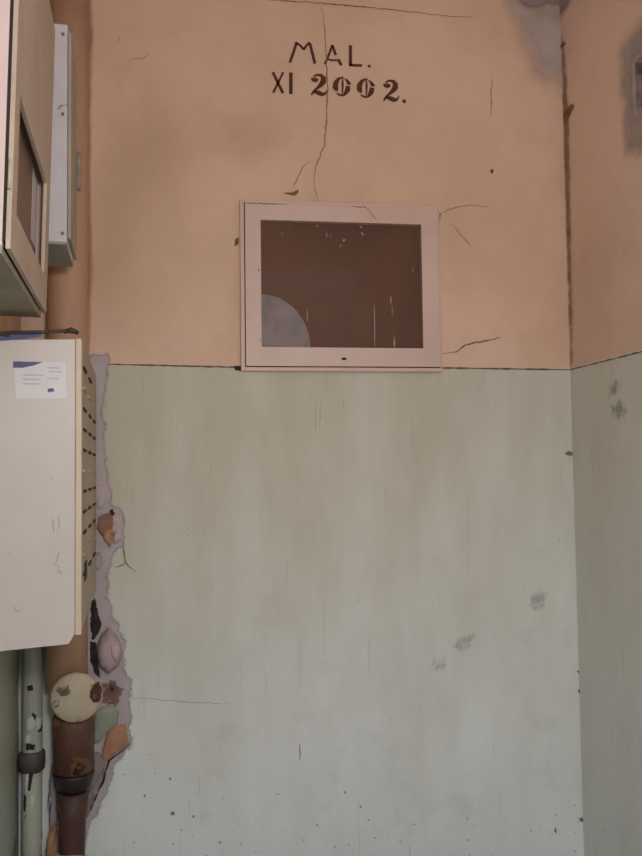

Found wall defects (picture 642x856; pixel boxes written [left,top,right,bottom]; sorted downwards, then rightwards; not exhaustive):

crack [248,0,469,205]
damp [513,0,572,324]
crack [442,337,501,354]
spalling [85,353,132,845]